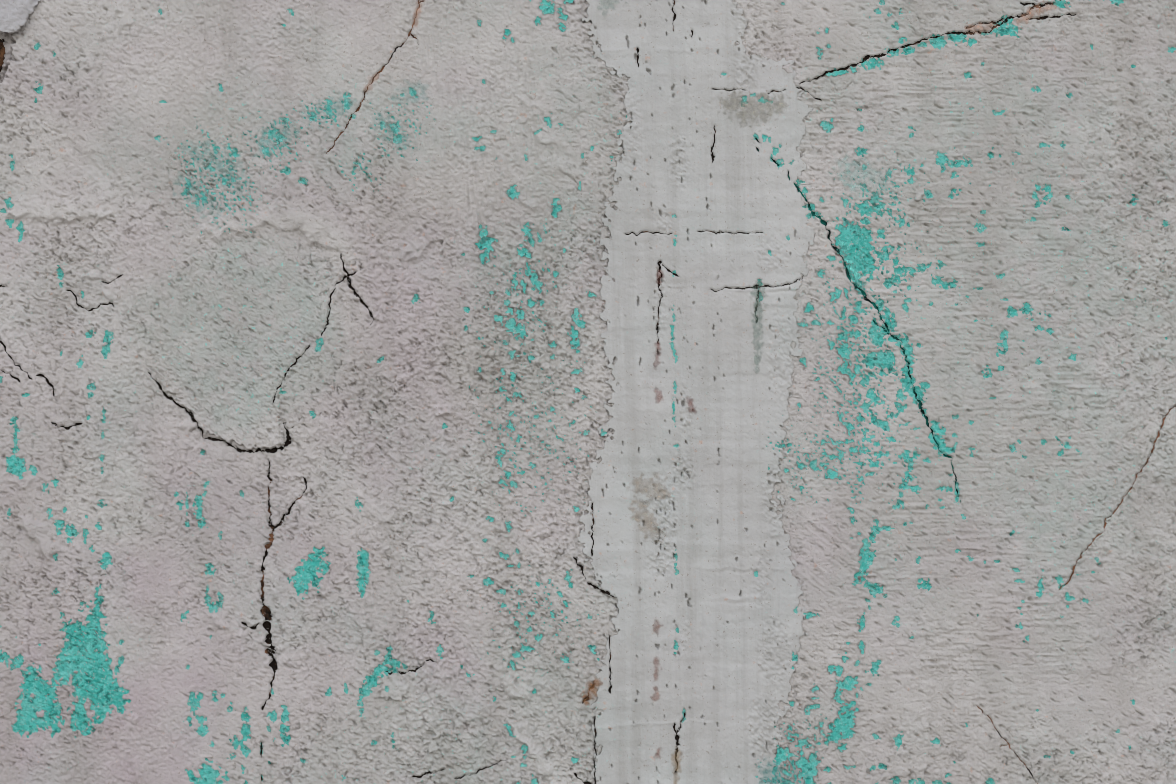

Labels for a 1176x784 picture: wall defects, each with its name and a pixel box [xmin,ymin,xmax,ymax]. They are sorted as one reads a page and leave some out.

peeling [0,0,41,83]
peeling [529,0,574,32]
crack [713,0,1076,100]
peeling [826,0,1022,77]
crack [755,138,961,502]
peeling [981,298,1054,379]
peeling [6,416,59,494]
crack [148,254,374,710]
peeling [755,147,983,784]
peeling [46,507,113,570]
peeling [0,584,132,738]
peeling [183,688,291,784]